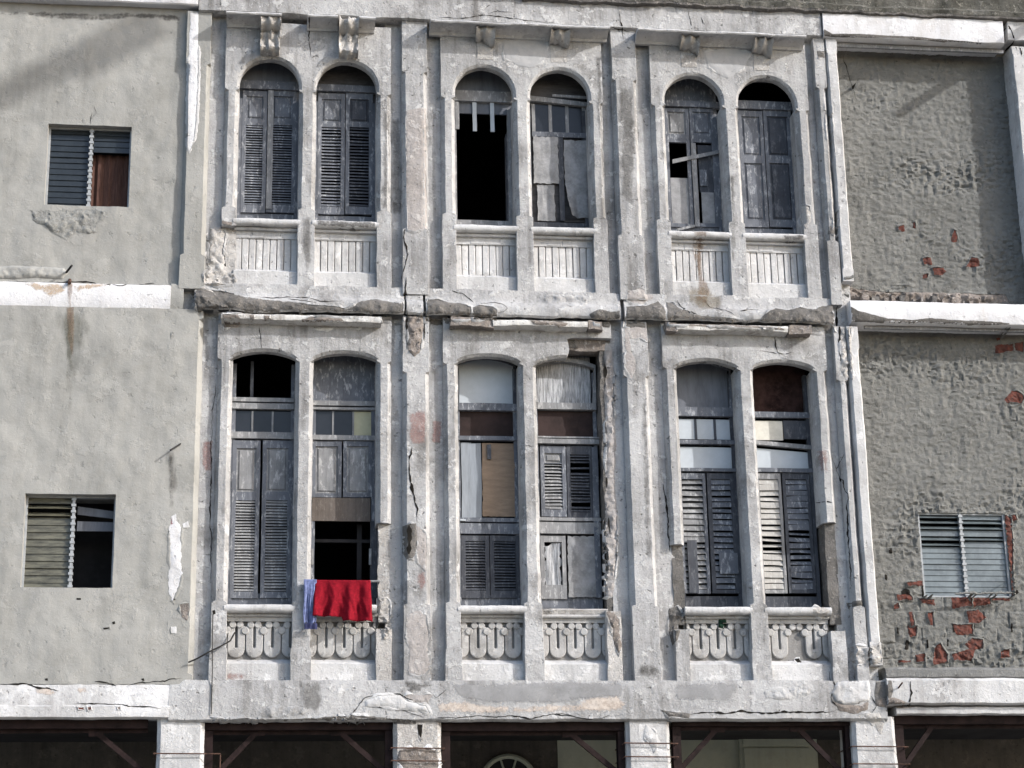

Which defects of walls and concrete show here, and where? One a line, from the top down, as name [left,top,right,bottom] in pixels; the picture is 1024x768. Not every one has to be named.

flaking render [31,208,108,240]
flaking render [191,226,499,356]
crack [407,448,418,554]
flaking render [529,256,1024,668]
peeling [167,514,192,634]
flaking render [210,691,624,768]
flaking render [834,680,913,734]